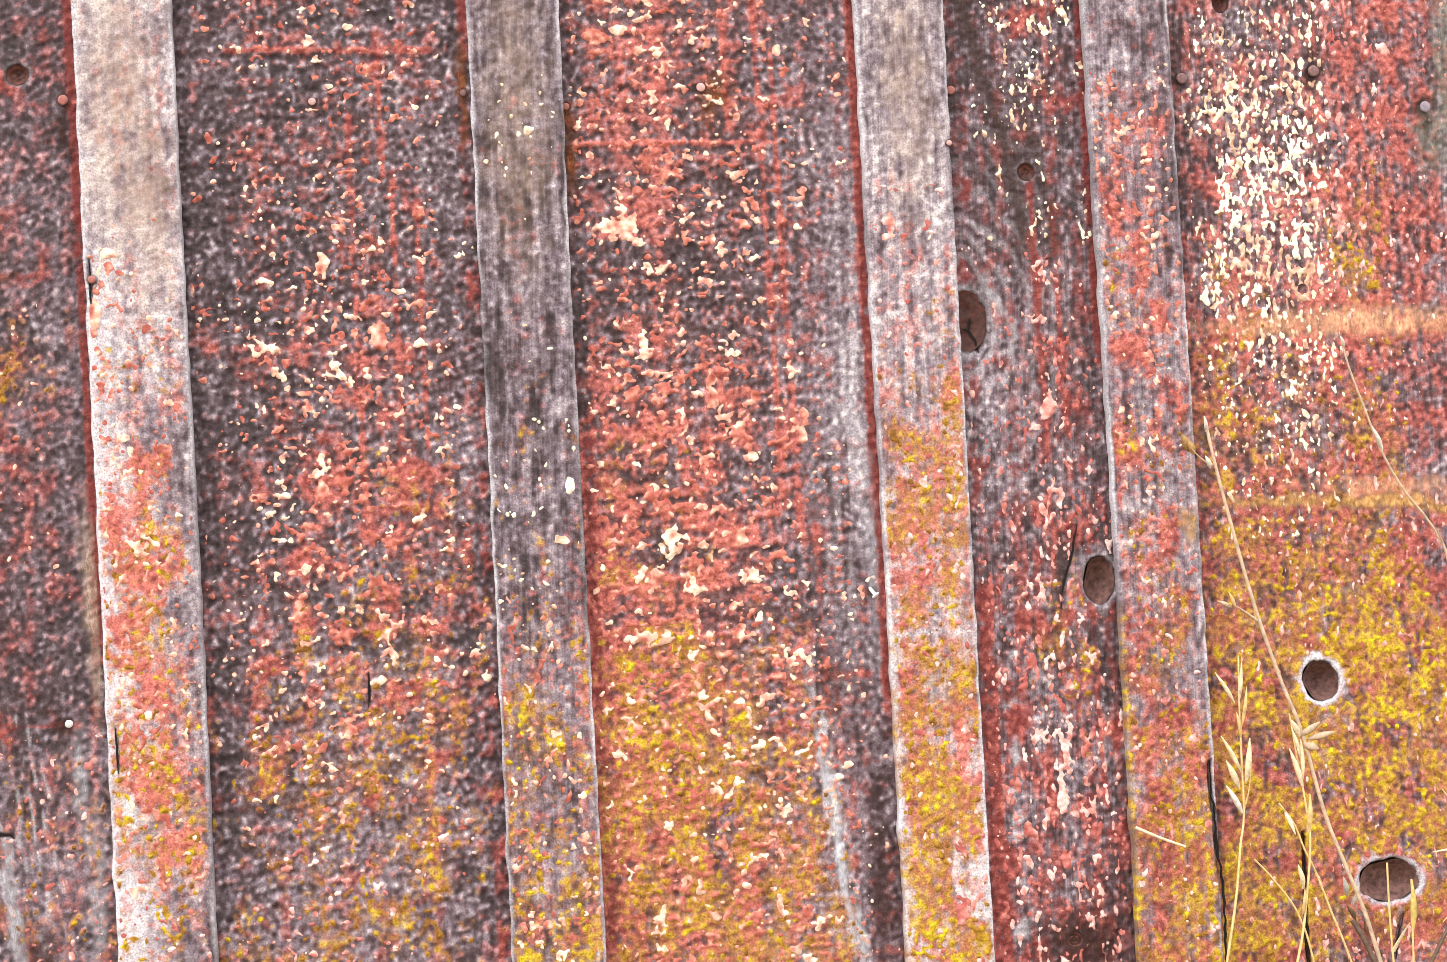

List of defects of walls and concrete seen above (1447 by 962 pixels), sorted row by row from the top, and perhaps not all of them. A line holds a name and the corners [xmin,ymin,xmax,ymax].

peeling [0,0,890,962]
peeling [870,0,1447,962]
crack [1209,761,1227,962]
crack [1302,832,1310,962]